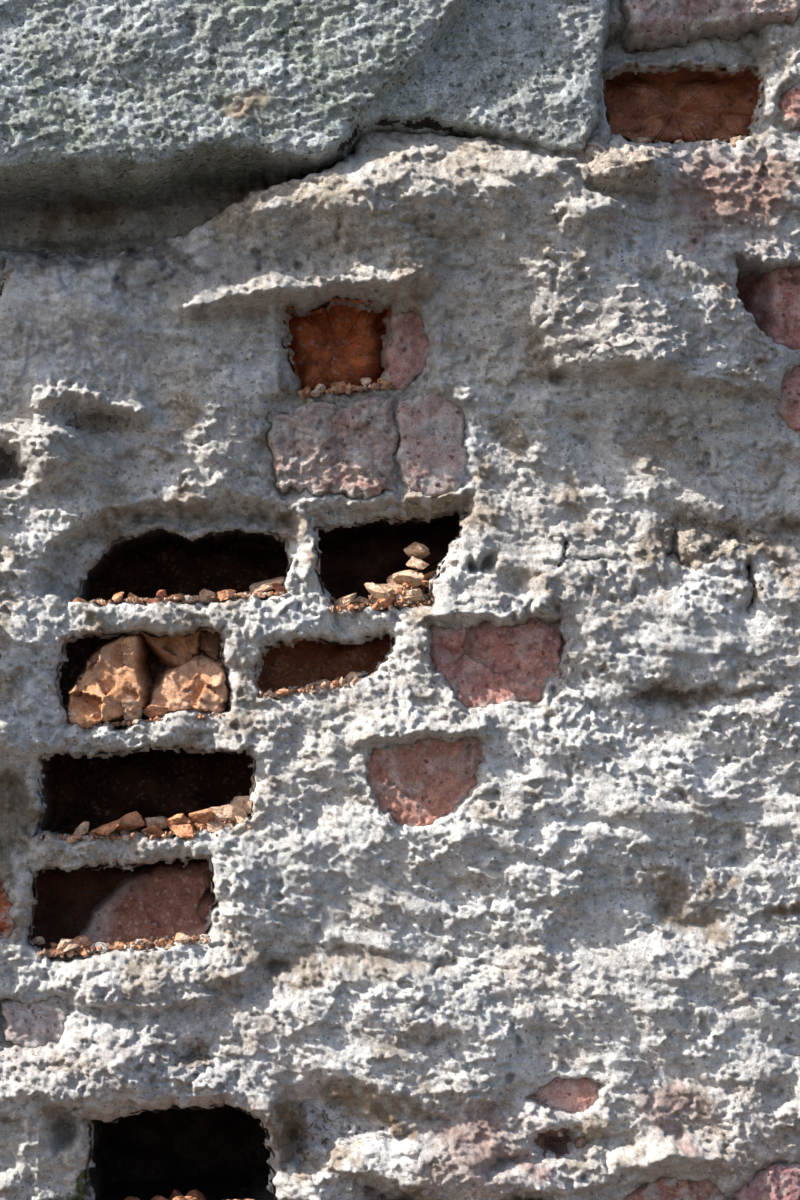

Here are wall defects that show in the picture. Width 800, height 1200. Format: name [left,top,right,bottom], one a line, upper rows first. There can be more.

spalling [282,298,392,395]
spalling [0,447,27,481]
spalling [65,407,130,435]
hole [70,528,292,607]
spalling [314,512,466,610]
spalling [55,628,230,730]
hole [255,634,393,699]
spalling [35,746,256,843]
spalling [28,855,217,961]
hole [86,1103,276,1200]